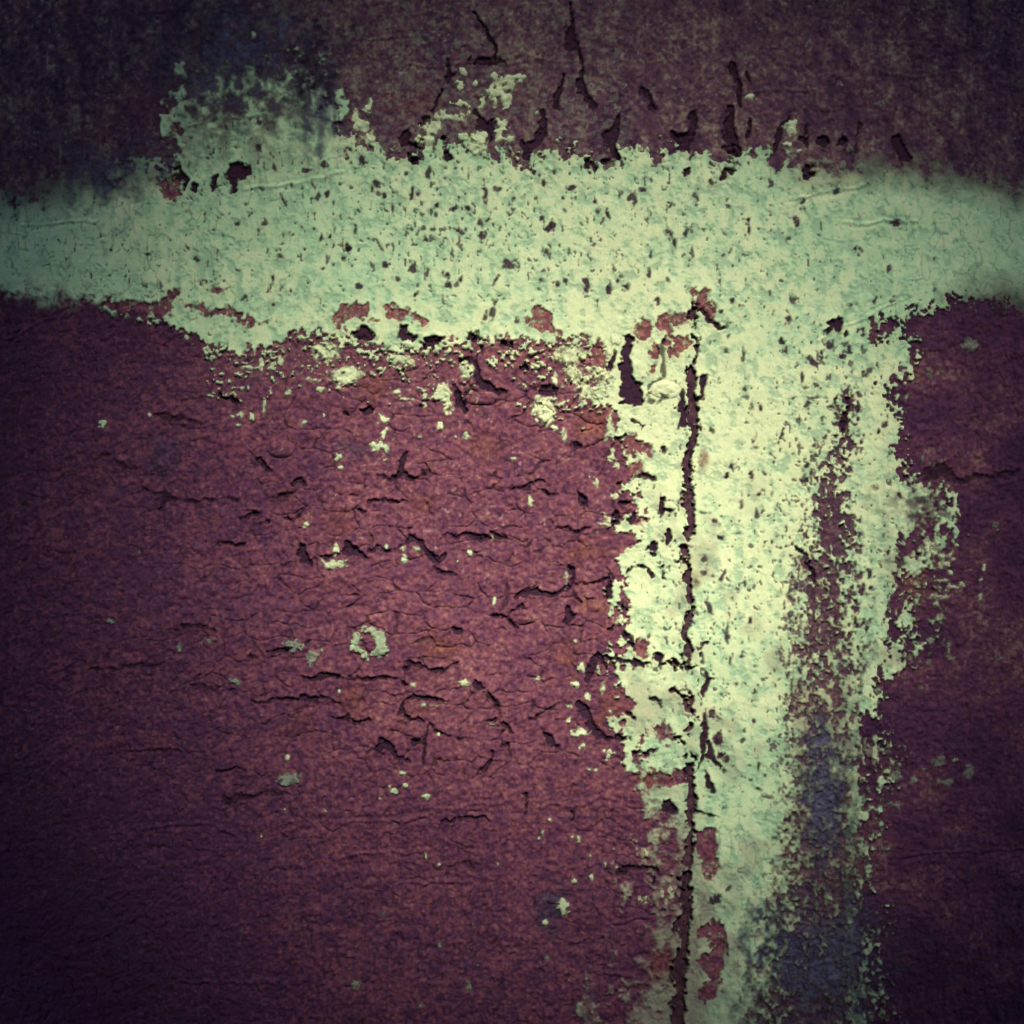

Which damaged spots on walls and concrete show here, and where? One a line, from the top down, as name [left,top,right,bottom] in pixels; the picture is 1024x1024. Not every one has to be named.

peeling [0,0,1024,216]
peeling [102,288,268,329]
peeling [297,283,442,393]
spalling [514,287,740,452]
crack [359,452,430,513]
crack [616,473,657,485]
crack [367,526,611,576]
crack [492,564,655,628]
spalling [646,529,672,579]
crack [249,631,662,775]
crack [689,641,725,817]
peeling [745,290,1024,1024]